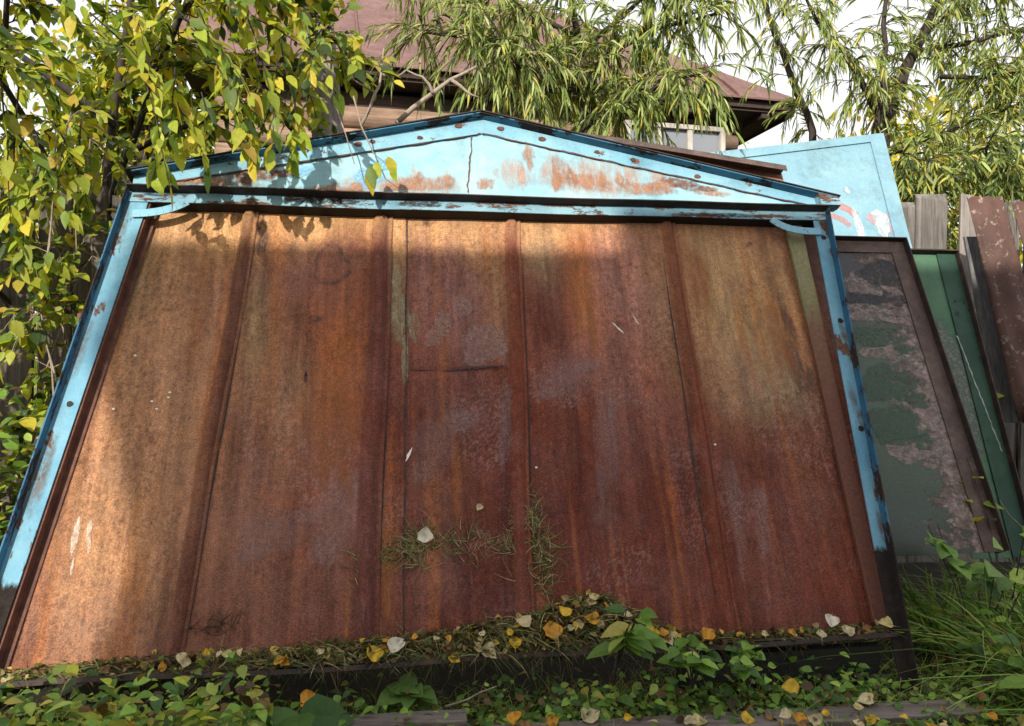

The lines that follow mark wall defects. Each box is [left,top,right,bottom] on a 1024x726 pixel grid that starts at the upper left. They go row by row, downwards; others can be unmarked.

rust [385,171,454,190]
rust [551,159,722,196]
peeling [858,344,919,360]
peeling [937,317,1002,454]
peeling [886,379,955,470]